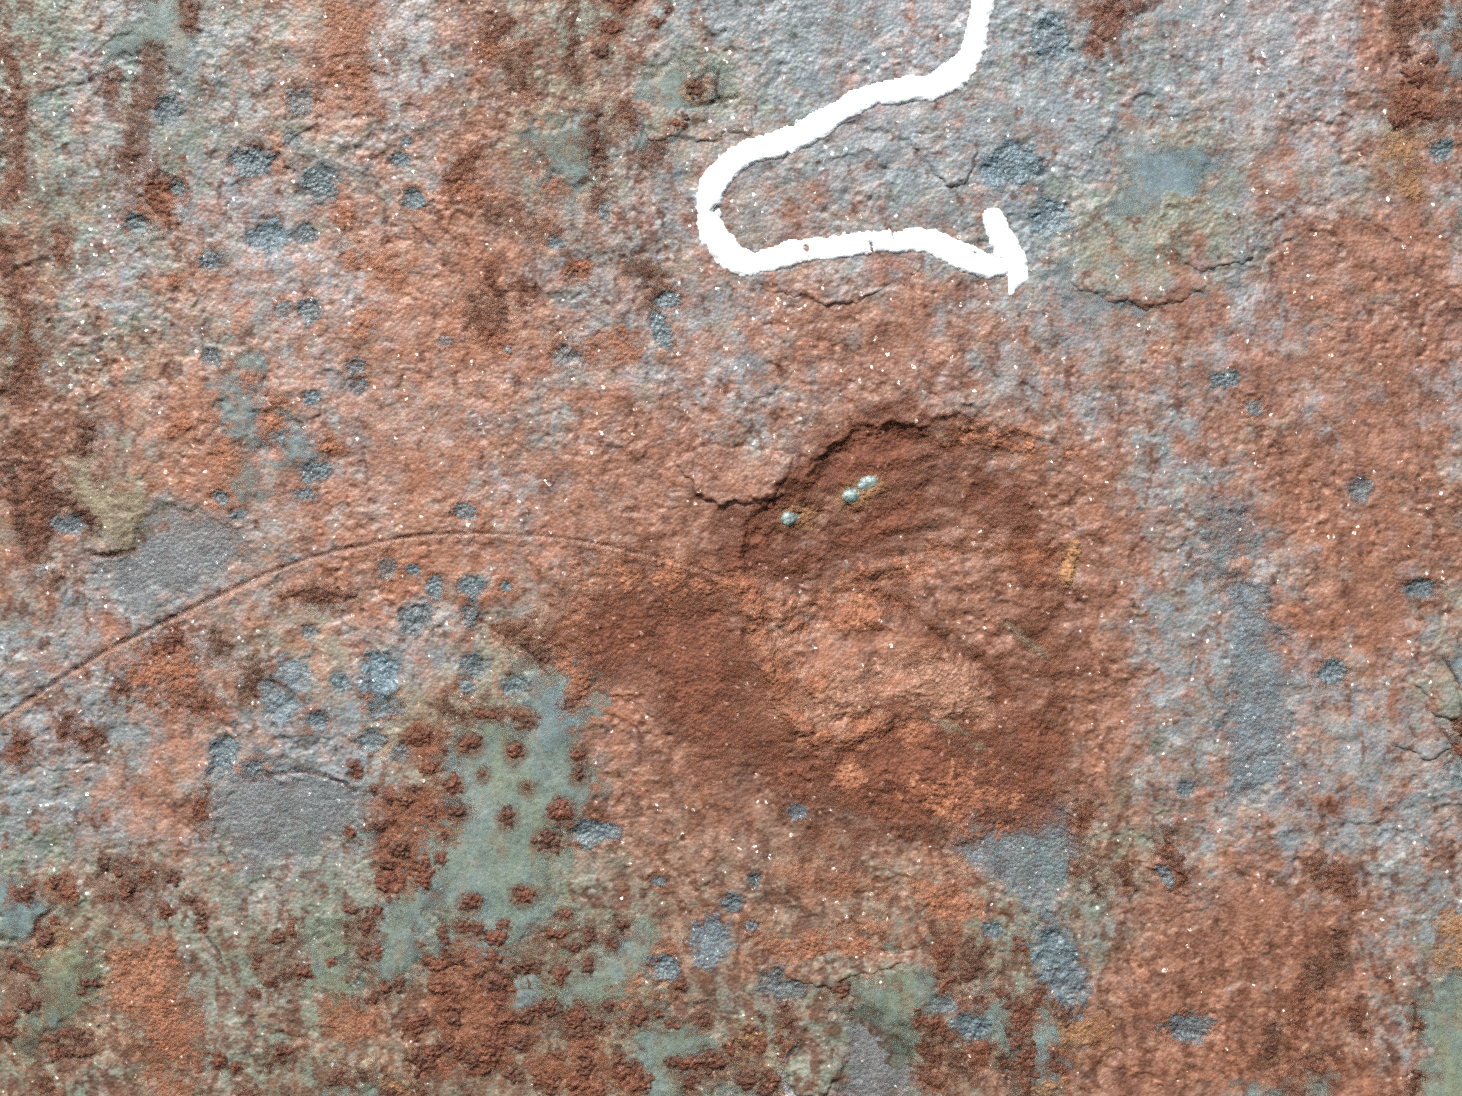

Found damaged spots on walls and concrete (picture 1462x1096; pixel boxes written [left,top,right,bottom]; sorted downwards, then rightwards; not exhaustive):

rust [565,0,640,82]
rust [667,79,706,132]
rust [602,535,1036,840]
crack [266,770,356,791]
rust [343,701,540,961]
rust [97,856,208,933]
rust [0,876,79,1043]
rust [76,932,192,1056]
rust [247,917,337,998]
rust [328,885,796,1096]
rust [911,882,1110,1096]
rust [204,1041,292,1096]